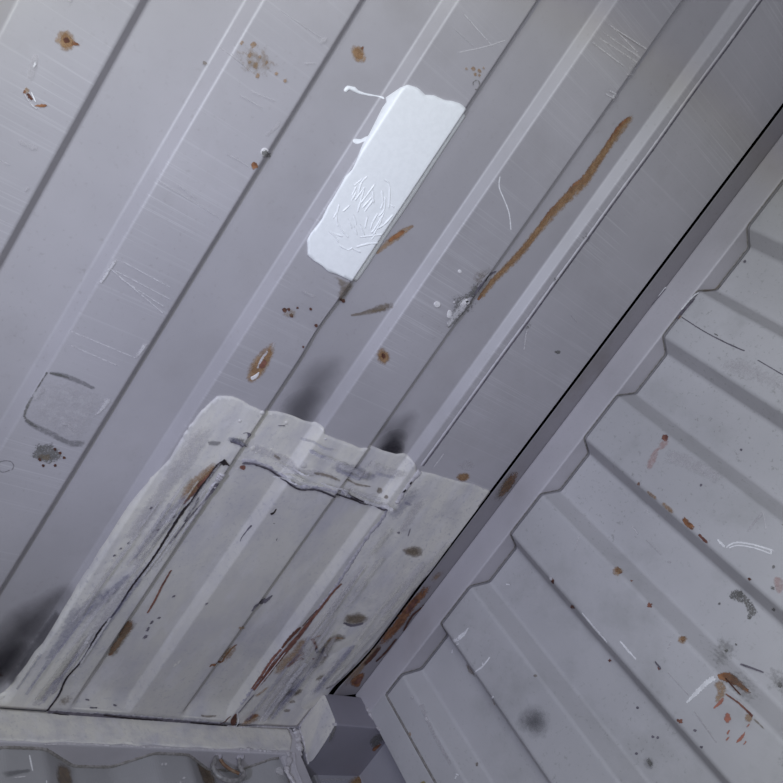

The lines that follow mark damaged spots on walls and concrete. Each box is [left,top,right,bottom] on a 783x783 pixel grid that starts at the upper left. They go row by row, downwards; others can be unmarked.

rust [56,31,79,49]
rust [352,47,366,61]
rust [478,117,631,300]
crack [46,441,387,726]
rust [350,587,429,688]
rust [714,673,763,744]
rust [58,766,72,783]